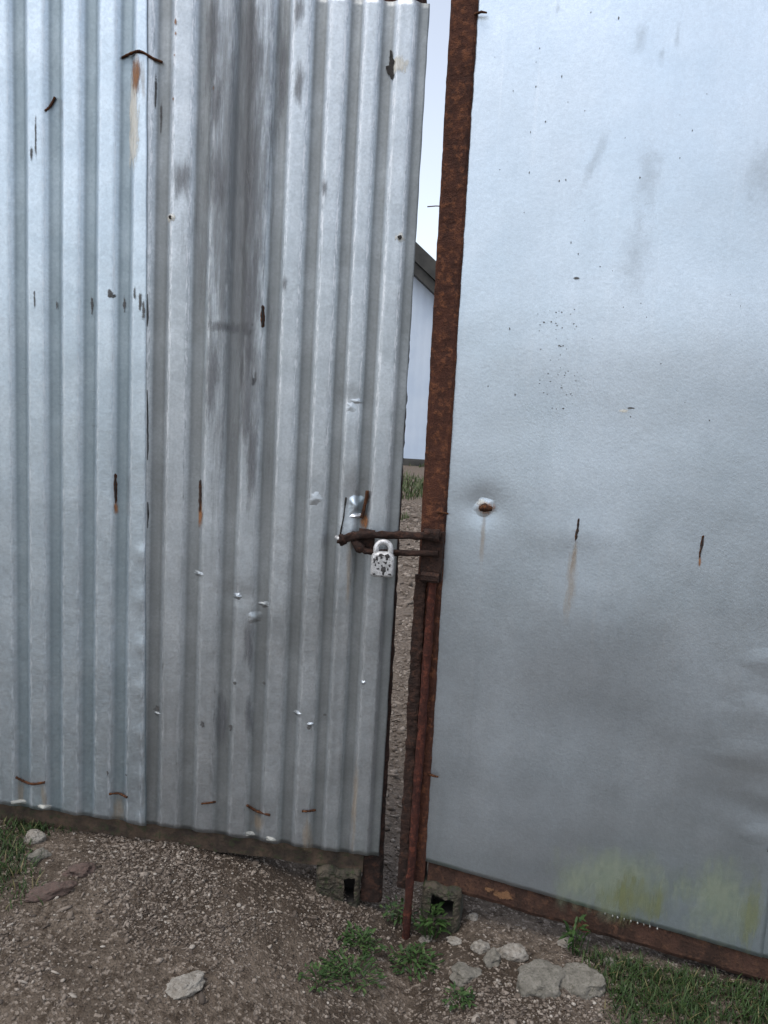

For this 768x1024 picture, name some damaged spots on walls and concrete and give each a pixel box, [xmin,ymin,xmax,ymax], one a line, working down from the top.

leakage [209,6,220,63]
leakage [280,50,302,101]
corrosion [130,57,140,162]
leakage [177,167,189,191]
leakage [213,260,257,490]
corrosion [360,490,369,528]
corrosion [485,887,513,899]